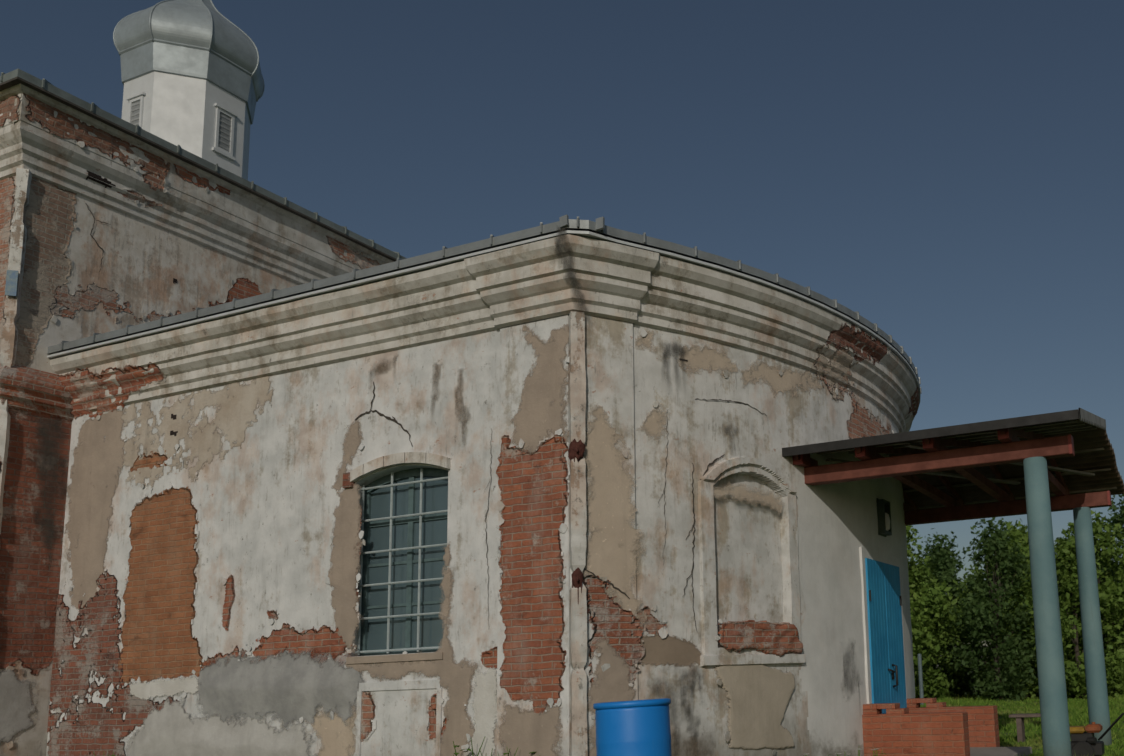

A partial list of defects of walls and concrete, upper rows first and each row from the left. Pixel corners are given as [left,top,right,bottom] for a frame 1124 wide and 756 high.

spalling [0,376,356,756]
peeling [332,420,364,495]
spalling [355,504,366,622]
crack [355,382,412,445]
spalling [481,324,570,756]
peeling [583,400,701,688]
crack [658,420,725,630]
peeling [679,345,894,439]